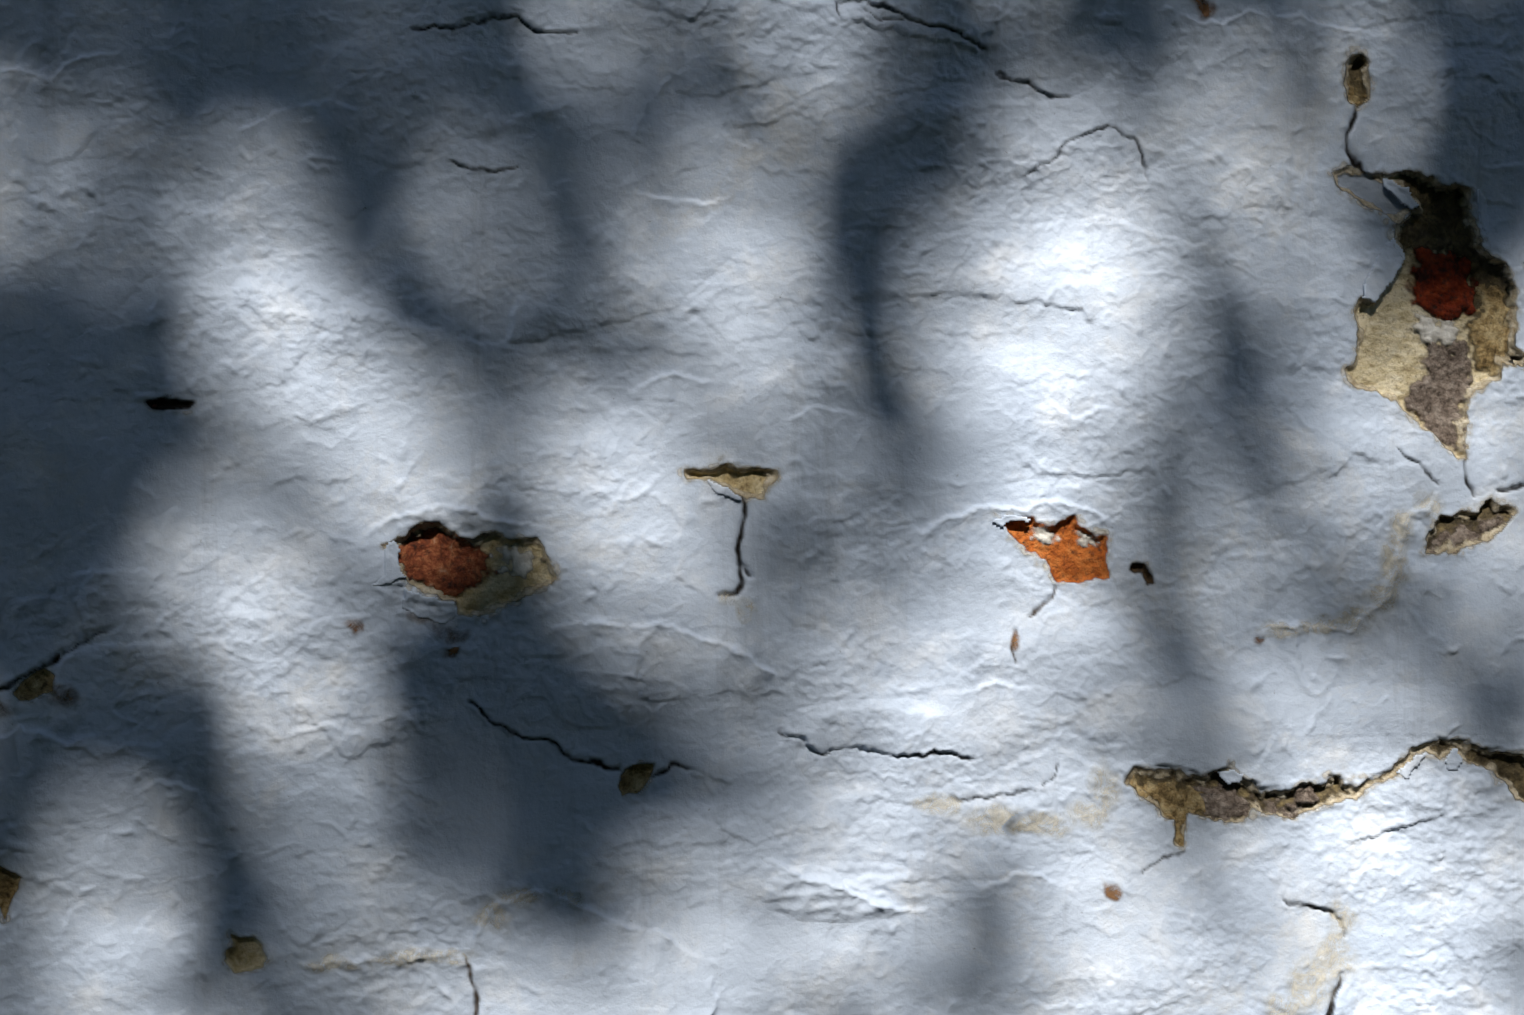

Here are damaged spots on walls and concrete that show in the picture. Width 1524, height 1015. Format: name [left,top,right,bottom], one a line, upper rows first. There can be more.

corrosion [1194,0,1215,18]
crack [836,0,1058,98]
flaking render [1328,162,1524,459]
flaking render [678,463,781,503]
flaking render [373,522,560,624]
crack [722,497,750,596]
flaking render [992,514,1111,584]
flaking render [1130,562,1154,585]
flaking render [1424,496,1518,555]
crack [0,632,102,690]
flaking render [1125,736,1524,850]
crack [466,960,479,1015]